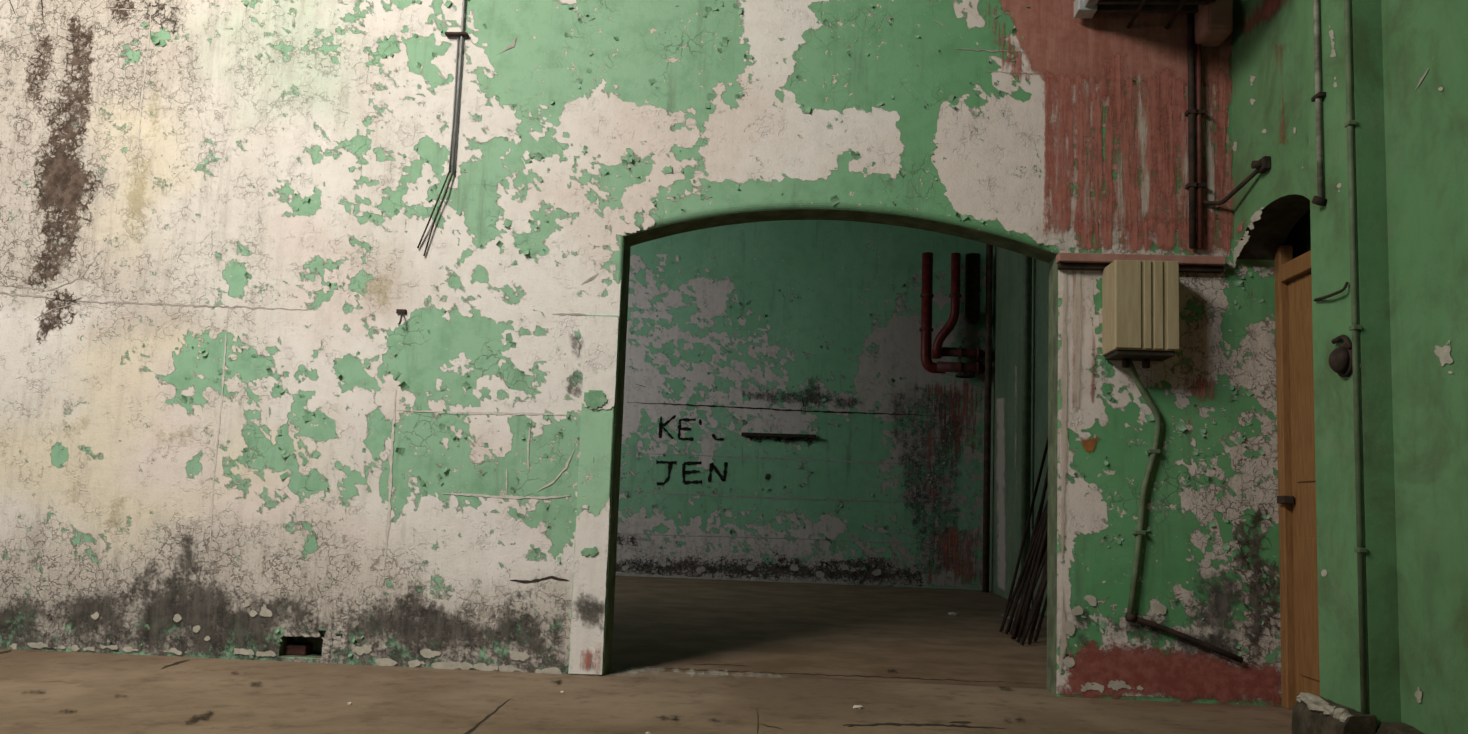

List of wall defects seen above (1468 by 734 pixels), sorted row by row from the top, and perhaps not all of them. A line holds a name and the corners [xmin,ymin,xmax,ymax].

water stain [110,0,178,34]
water stain [26,16,103,344]
corrosion [984,0,1284,254]
water stain [616,386,964,587]
water stain [744,380,862,409]
peeling [924,0,1353,722]
water stain [0,534,569,685]
water stain [575,596,605,625]
water stain [1057,503,1282,707]